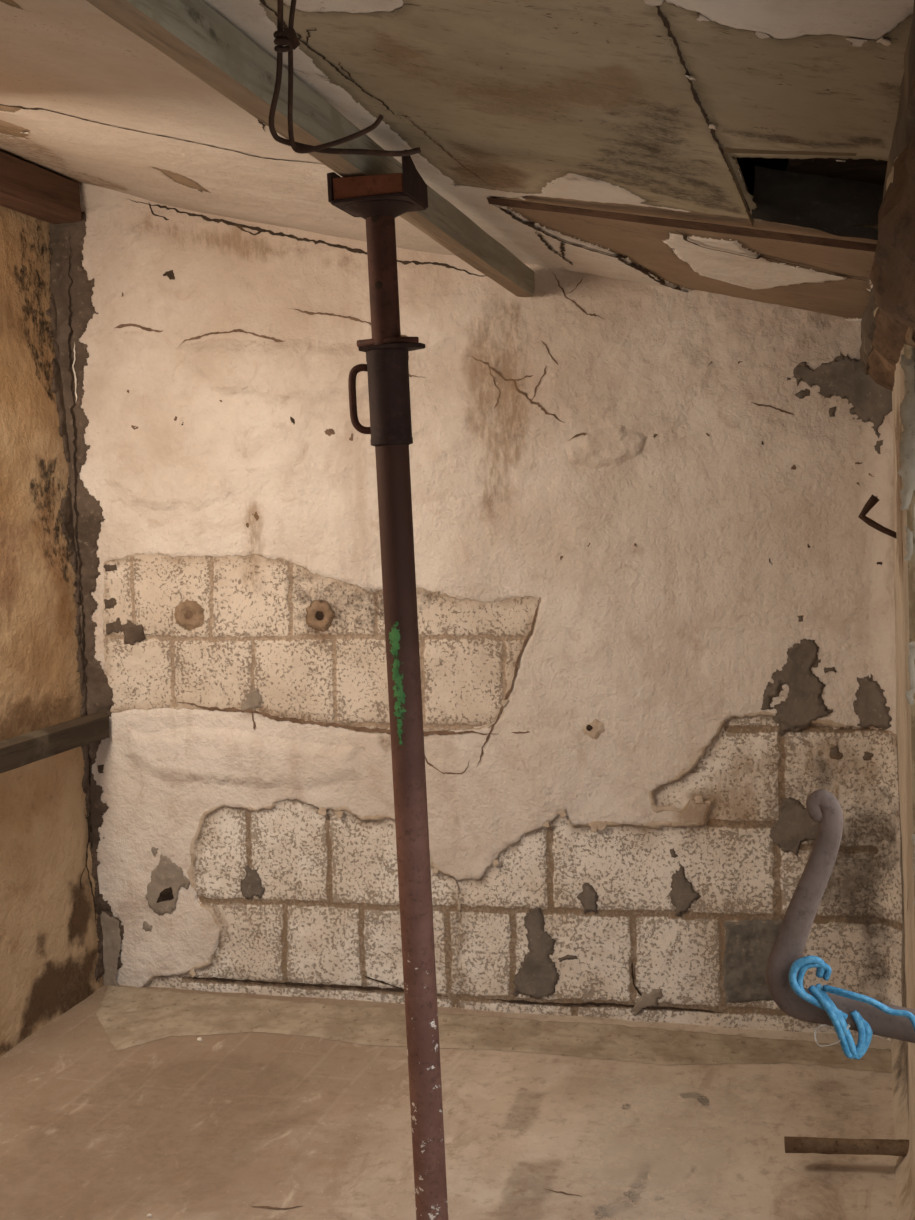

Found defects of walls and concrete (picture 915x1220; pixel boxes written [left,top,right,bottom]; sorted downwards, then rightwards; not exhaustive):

peeling [152,167,211,193]
crack [131,200,367,255]
peeling [259,0,913,319]
crack [468,341,565,423]
water stain [30,459,69,581]
peeling [46,294,87,717]
flaking render [102,553,390,734]
flaking render [416,587,541,731]
water stain [0,884,97,1052]
peeling [81,744,105,983]
flaking render [143,799,405,1004]
flaking render [430,711,915,1041]